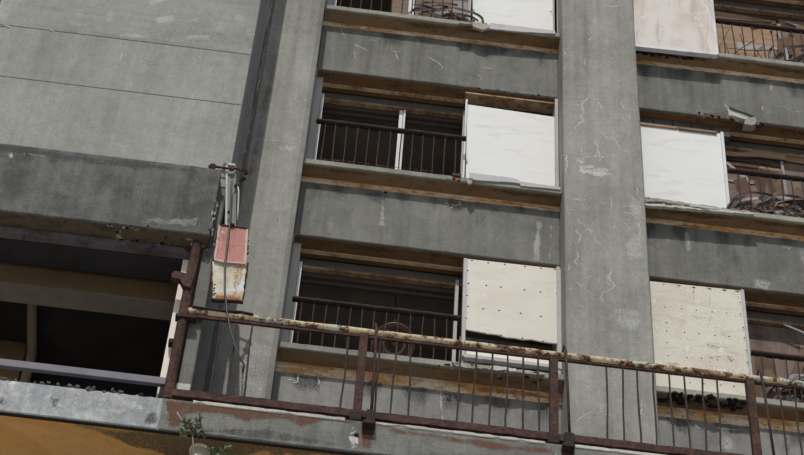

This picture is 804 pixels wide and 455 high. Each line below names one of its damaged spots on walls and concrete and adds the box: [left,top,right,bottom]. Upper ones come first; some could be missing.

crack [565,93,630,172]
spalling [640,106,765,144]
water stain [0,144,195,206]
crack [564,188,643,307]
water stain [75,399,182,454]
rust [166,400,328,429]
rust [391,428,552,453]